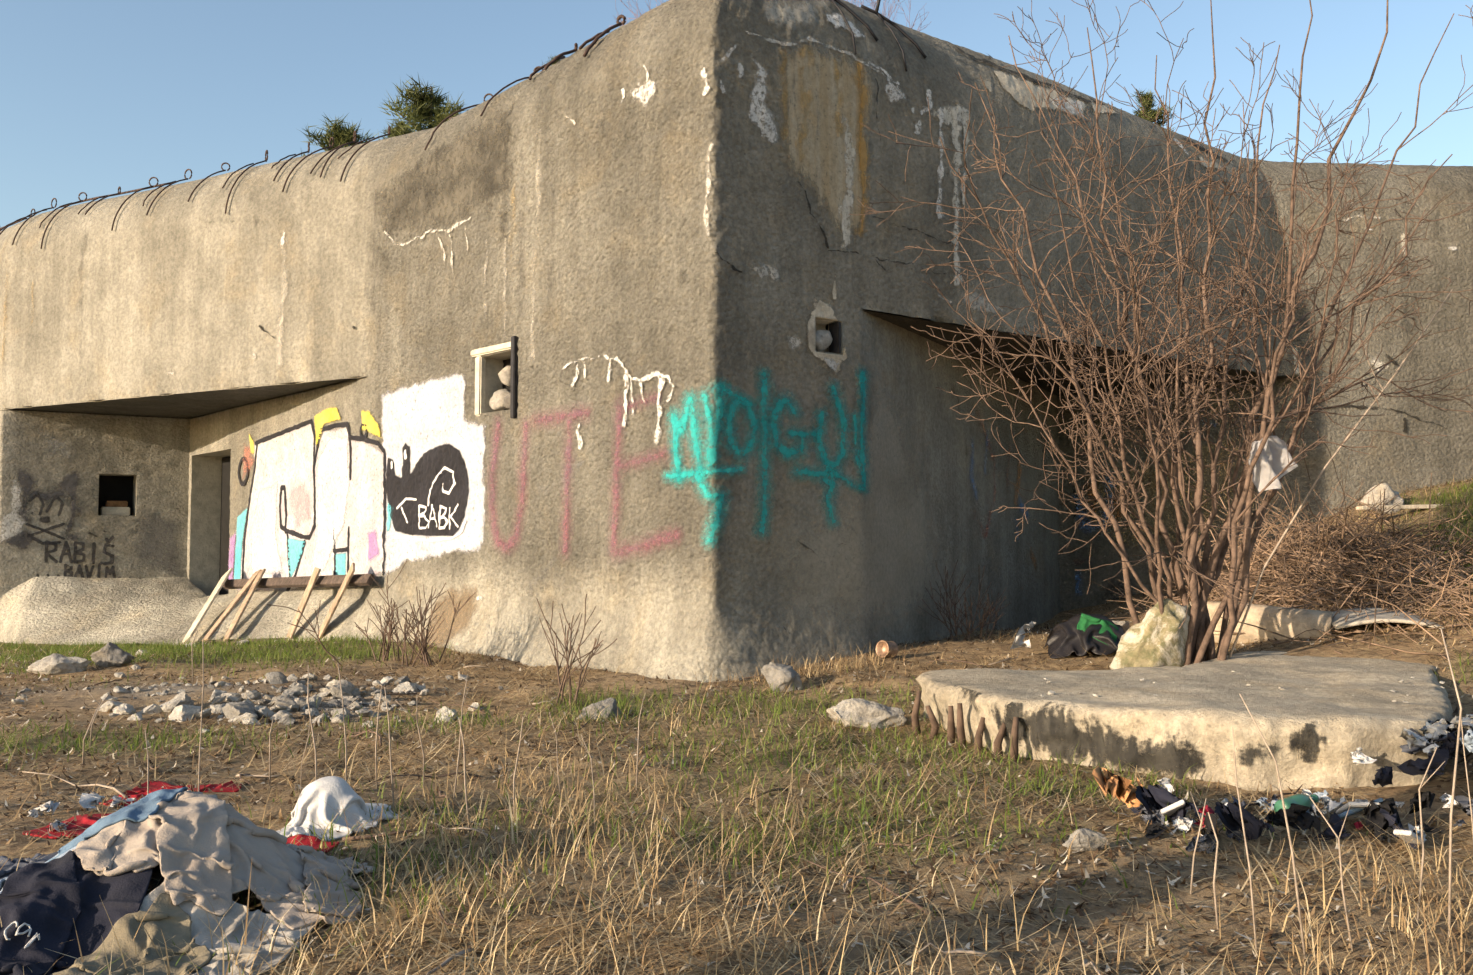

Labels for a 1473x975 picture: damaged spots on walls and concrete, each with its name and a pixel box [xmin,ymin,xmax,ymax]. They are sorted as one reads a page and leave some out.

peeling [701,45,777,143]
spalling [985,71,1117,118]
peeling [703,143,713,236]
corrosion [781,47,871,247]
damp [746,2,1003,313]